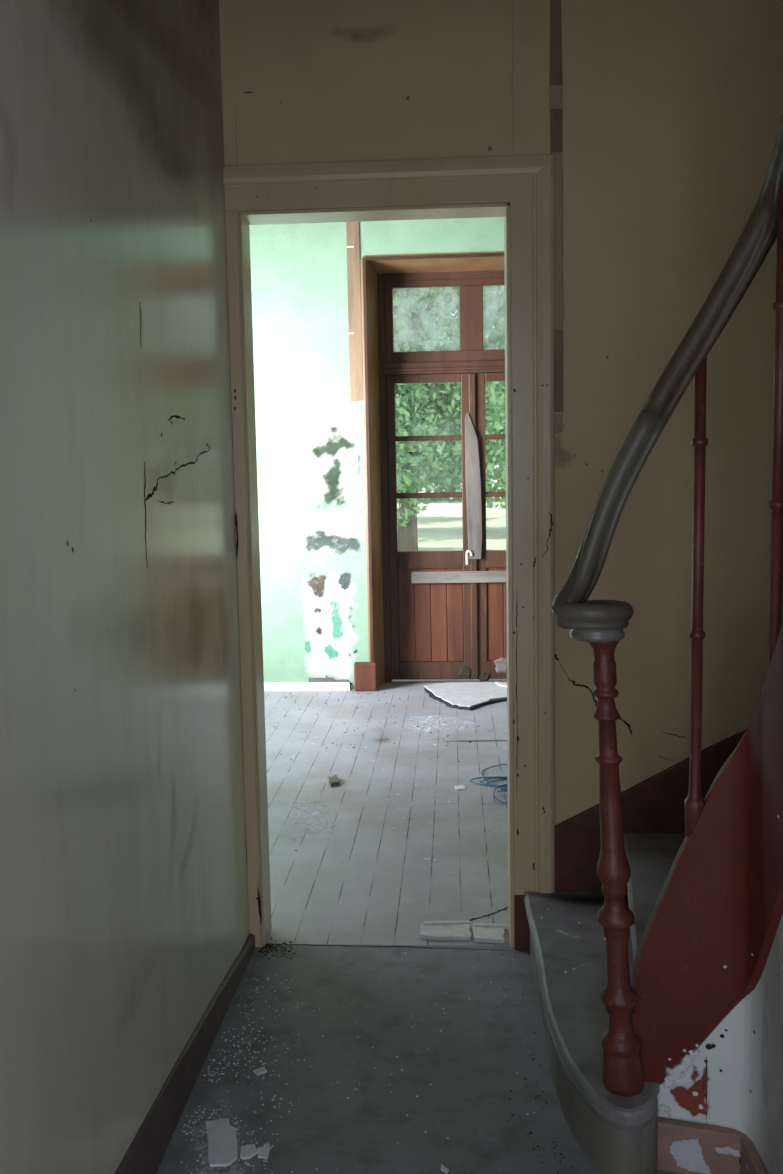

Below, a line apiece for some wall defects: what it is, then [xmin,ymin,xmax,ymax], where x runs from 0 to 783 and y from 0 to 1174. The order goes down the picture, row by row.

crack [144,443,210,569]
peeling [285,389,366,689]
peeling [513,588,534,792]
crack [554,654,632,735]
peeling [658,1029,728,1116]
peeling [670,1138,712,1174]
peeling [716,1147,748,1170]